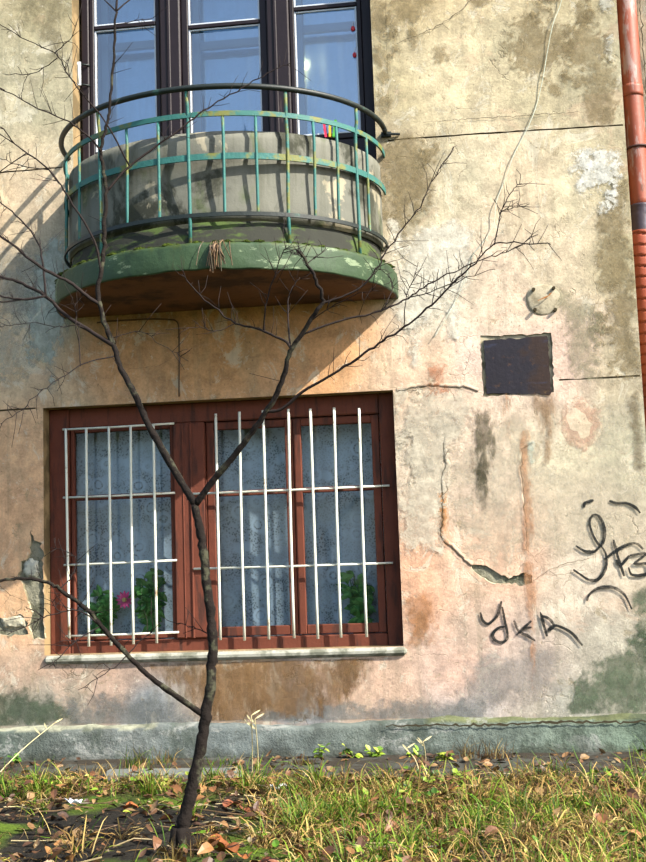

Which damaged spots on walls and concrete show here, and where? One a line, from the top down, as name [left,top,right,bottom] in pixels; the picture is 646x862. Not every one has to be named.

crack [638,2,646,100]
peeling [556,148,642,379]
crack [440,435,474,566]
damp [475,411,495,501]
flaking render [0,531,46,640]
damp [633,590,646,645]
damp [151,659,483,721]